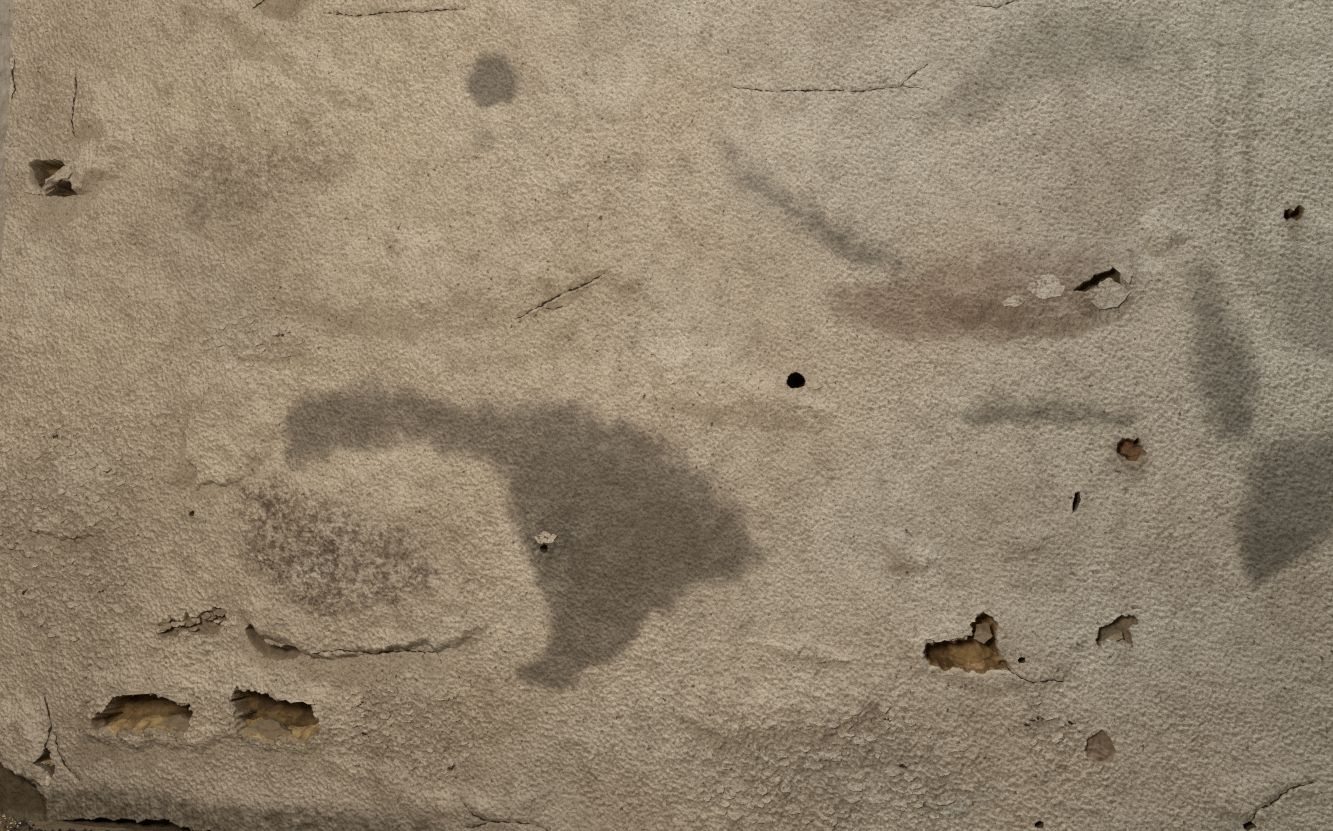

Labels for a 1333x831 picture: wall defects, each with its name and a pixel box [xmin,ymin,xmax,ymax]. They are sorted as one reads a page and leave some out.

spalling [24,159,79,199]
spalling [1001,263,1133,309]
spalling [1116,437,1147,465]
spalling [918,612,1025,681]
spalling [1095,615,1138,651]
spalling [90,684,193,742]
spalling [222,687,320,751]
peeling [1024,698,1076,752]
spalling [1084,729,1116,766]